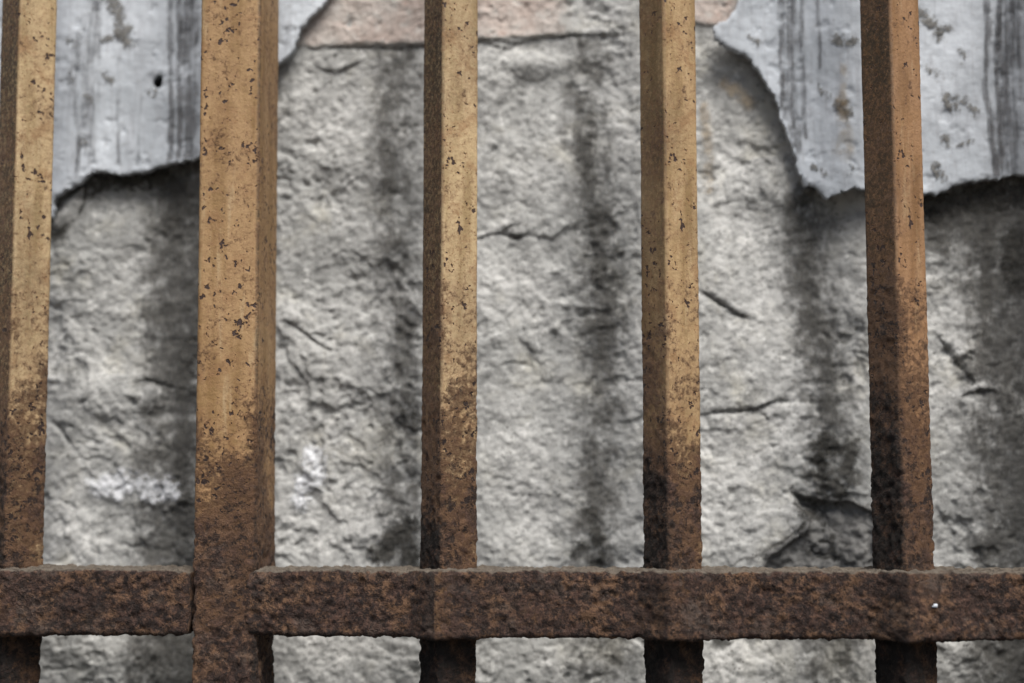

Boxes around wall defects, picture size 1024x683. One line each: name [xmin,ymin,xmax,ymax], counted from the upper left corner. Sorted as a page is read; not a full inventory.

flaking render [51,0,202,230]
water stain [377,47,414,215]
flaking render [695,0,865,200]
flaking render [918,0,1024,197]
water stain [51,0,200,567]
water stain [366,223,422,567]
water stain [566,35,624,568]
water stain [782,187,861,562]
water stain [127,632,195,683]